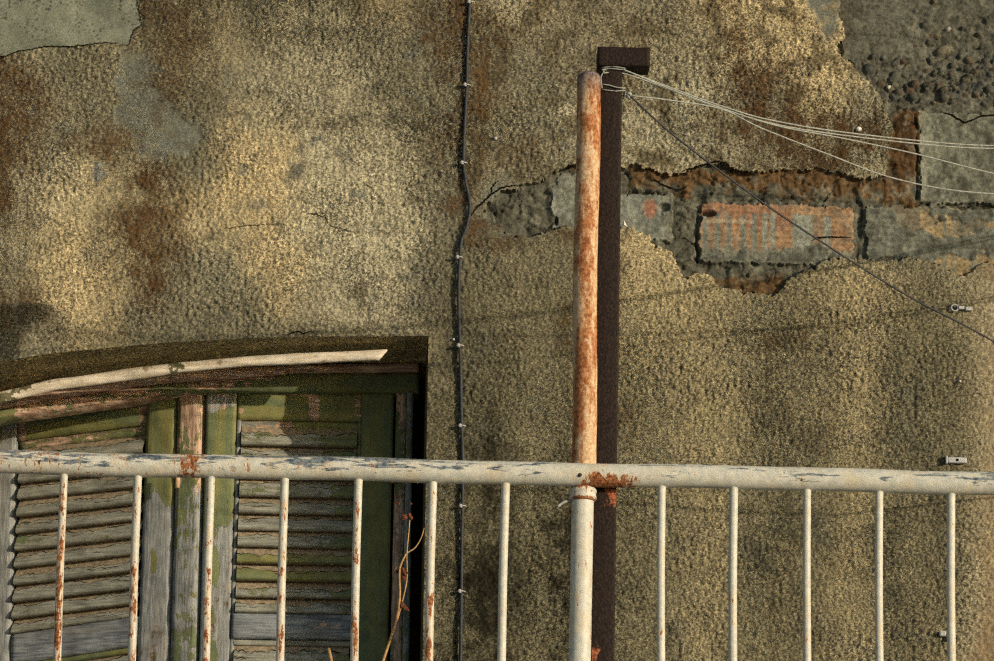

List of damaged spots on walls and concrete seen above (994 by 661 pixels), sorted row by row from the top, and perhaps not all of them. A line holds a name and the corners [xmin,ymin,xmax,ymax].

spalling [479,164,576,238]
spalling [620,0,994,297]
crack [943,112,994,124]
leakage [535,486,572,614]